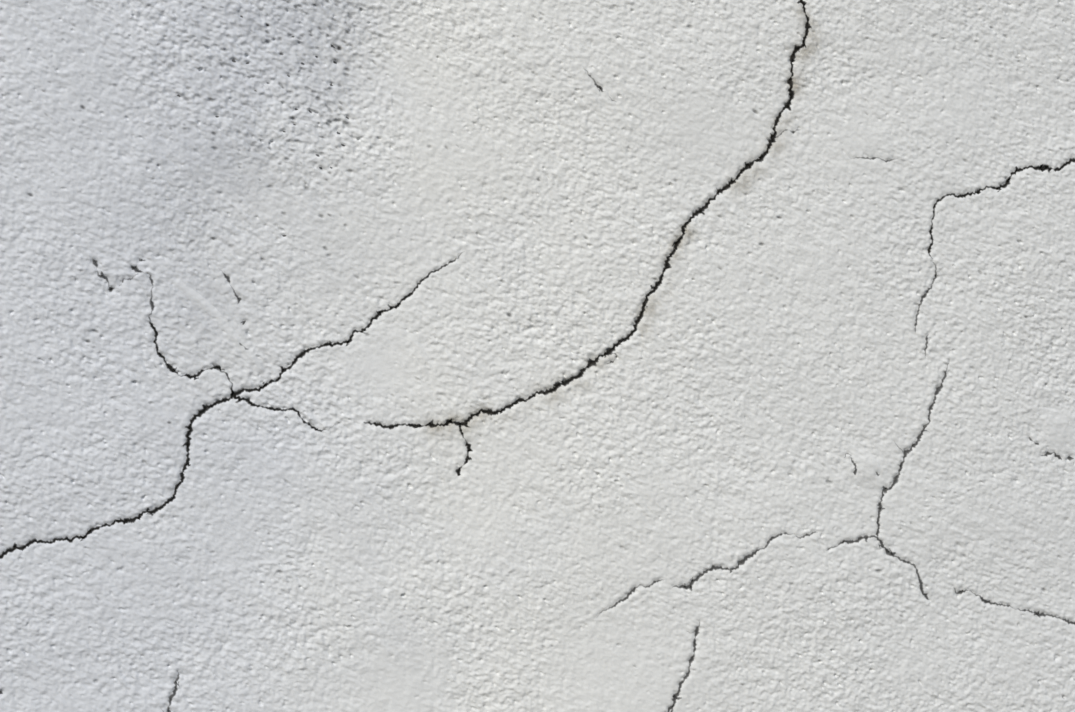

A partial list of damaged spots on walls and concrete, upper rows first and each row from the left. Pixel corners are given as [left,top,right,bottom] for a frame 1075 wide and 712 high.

crack [368,0,811,476]
crack [915,158,1075,350]
crack [0,259,455,558]
crack [614,371,946,606]
crack [668,627,699,712]
crack [955,590,1075,624]